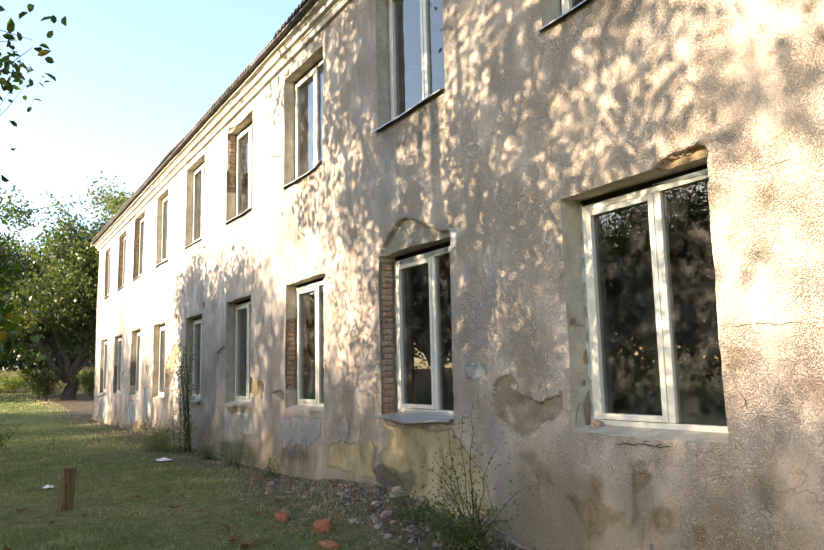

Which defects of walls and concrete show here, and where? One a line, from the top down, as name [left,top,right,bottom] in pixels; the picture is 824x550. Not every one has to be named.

spalling [651,143,708,171]
peeling [304,230,321,269]
flaking render [380,217,450,414]
flaking render [250,318,297,401]
peeling [226,405,252,435]
spalling [490,374,563,437]